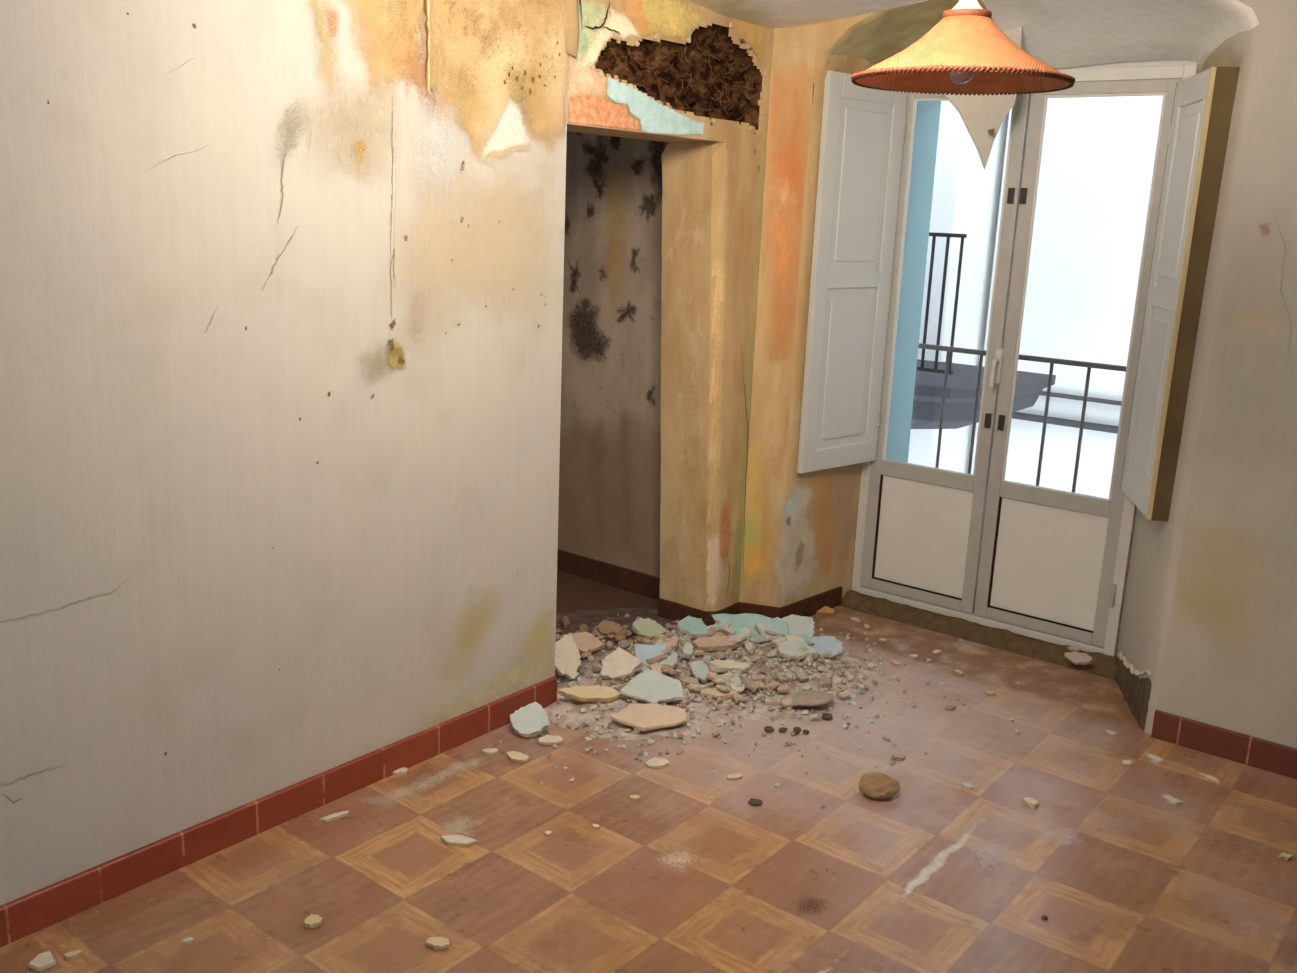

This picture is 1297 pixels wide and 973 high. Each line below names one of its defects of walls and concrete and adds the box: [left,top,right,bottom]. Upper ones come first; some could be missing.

spalling [560,0,768,136]
peeling [479,97,532,161]
peeling [944,93,1016,170]
crack [262,227,298,290]
crack [0,578,129,623]
spalling [1114,651,1152,731]
crack [0,765,67,804]